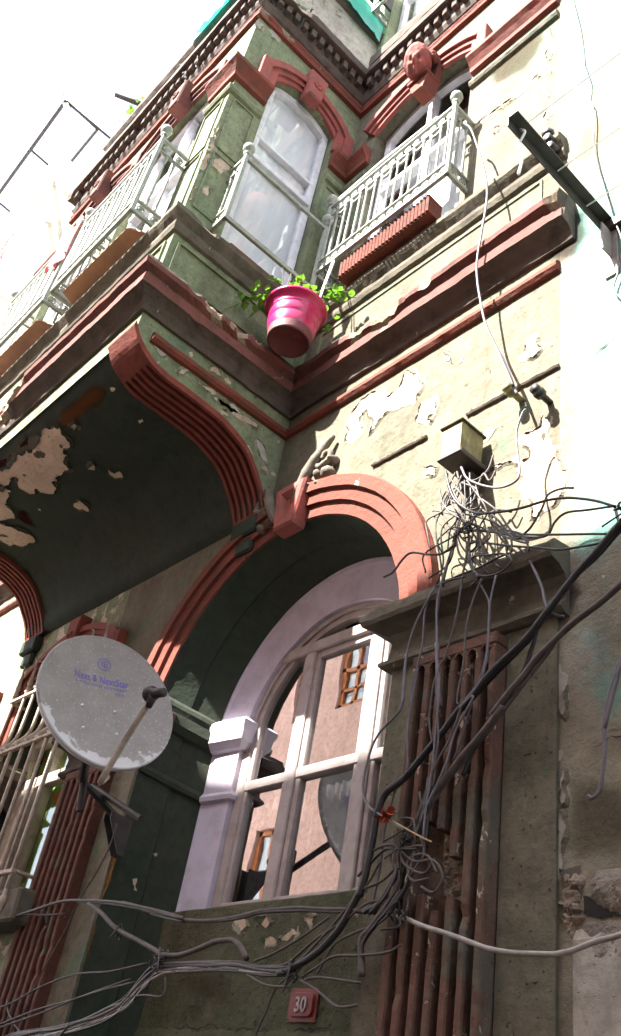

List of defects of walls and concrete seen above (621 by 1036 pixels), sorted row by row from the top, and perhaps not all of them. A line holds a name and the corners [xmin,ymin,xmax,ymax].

peeling [518,332,545,362]
peeling [343,367,439,444]
peeling [0,420,124,549]
peeling [489,411,571,521]
peeling [558,661,572,722]
spalling [557,750,621,940]
peeling [231,913,318,949]